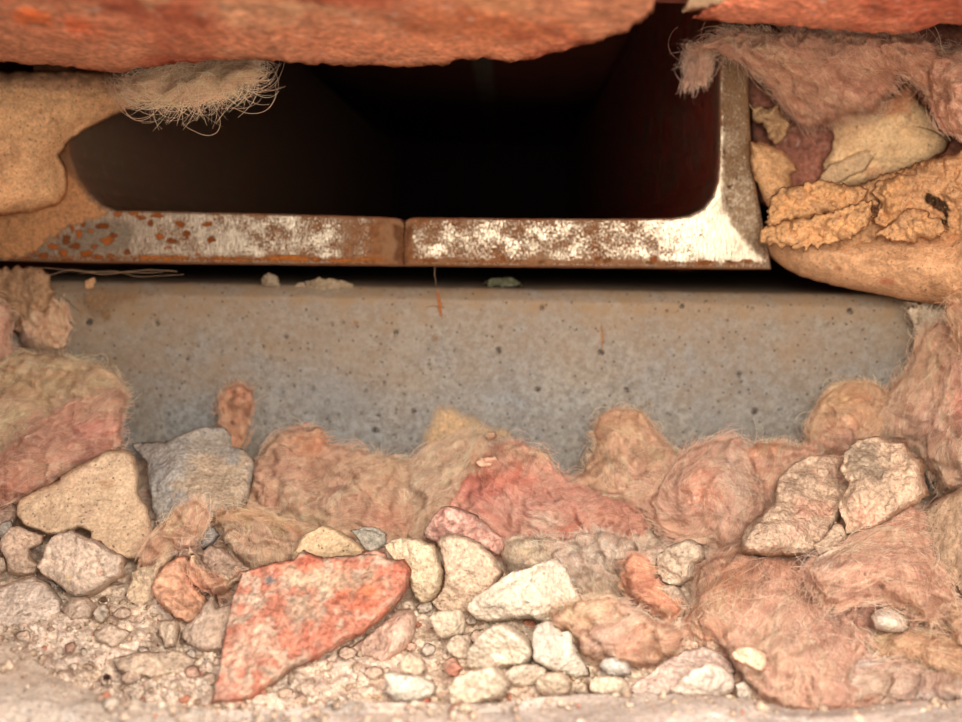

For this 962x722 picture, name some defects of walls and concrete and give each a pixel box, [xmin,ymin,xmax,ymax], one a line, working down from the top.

rust [9,211,412,264]